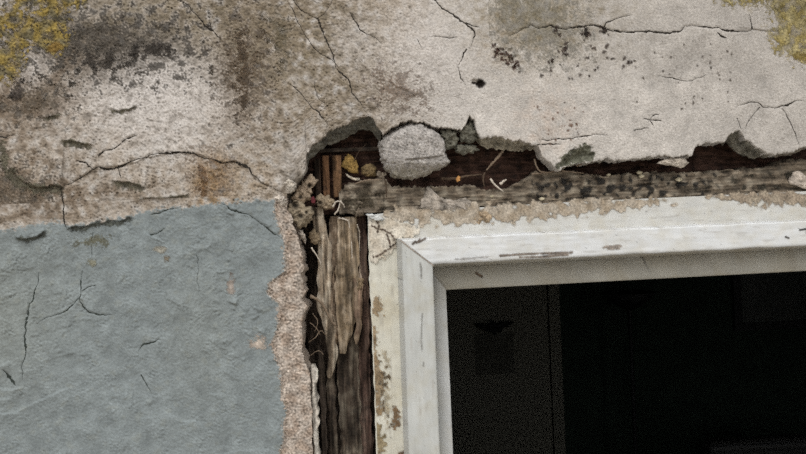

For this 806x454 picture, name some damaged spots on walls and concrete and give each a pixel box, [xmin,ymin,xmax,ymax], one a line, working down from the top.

crack [434,0,478,82]
crack [516,14,760,38]
flaking render [0,0,806,204]
crack [537,134,607,145]
crack [737,100,800,143]
crack [60,136,283,228]
crack [224,204,280,237]
peeling [705,191,806,209]
peeling [250,200,313,454]
peeling [372,296,385,317]
peeling [373,326,401,454]